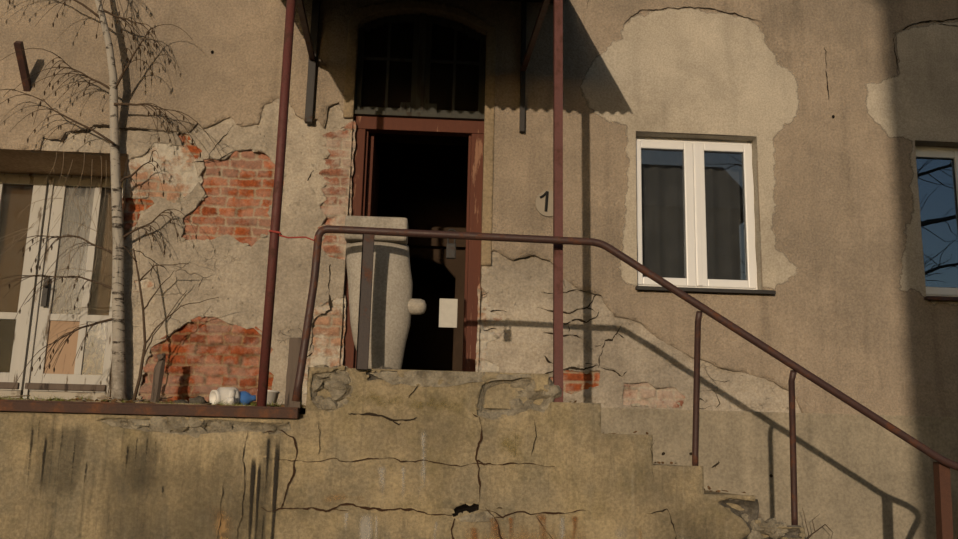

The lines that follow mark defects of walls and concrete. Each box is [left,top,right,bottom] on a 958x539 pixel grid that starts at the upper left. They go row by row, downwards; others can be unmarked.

peeling [30,99,356,412]
crack [538,288,627,377]
peeling [366,251,802,420]
crack [349,387,417,425]
water stain [249,439,279,539]
crack [217,413,586,539]
spalling [716,498,806,539]